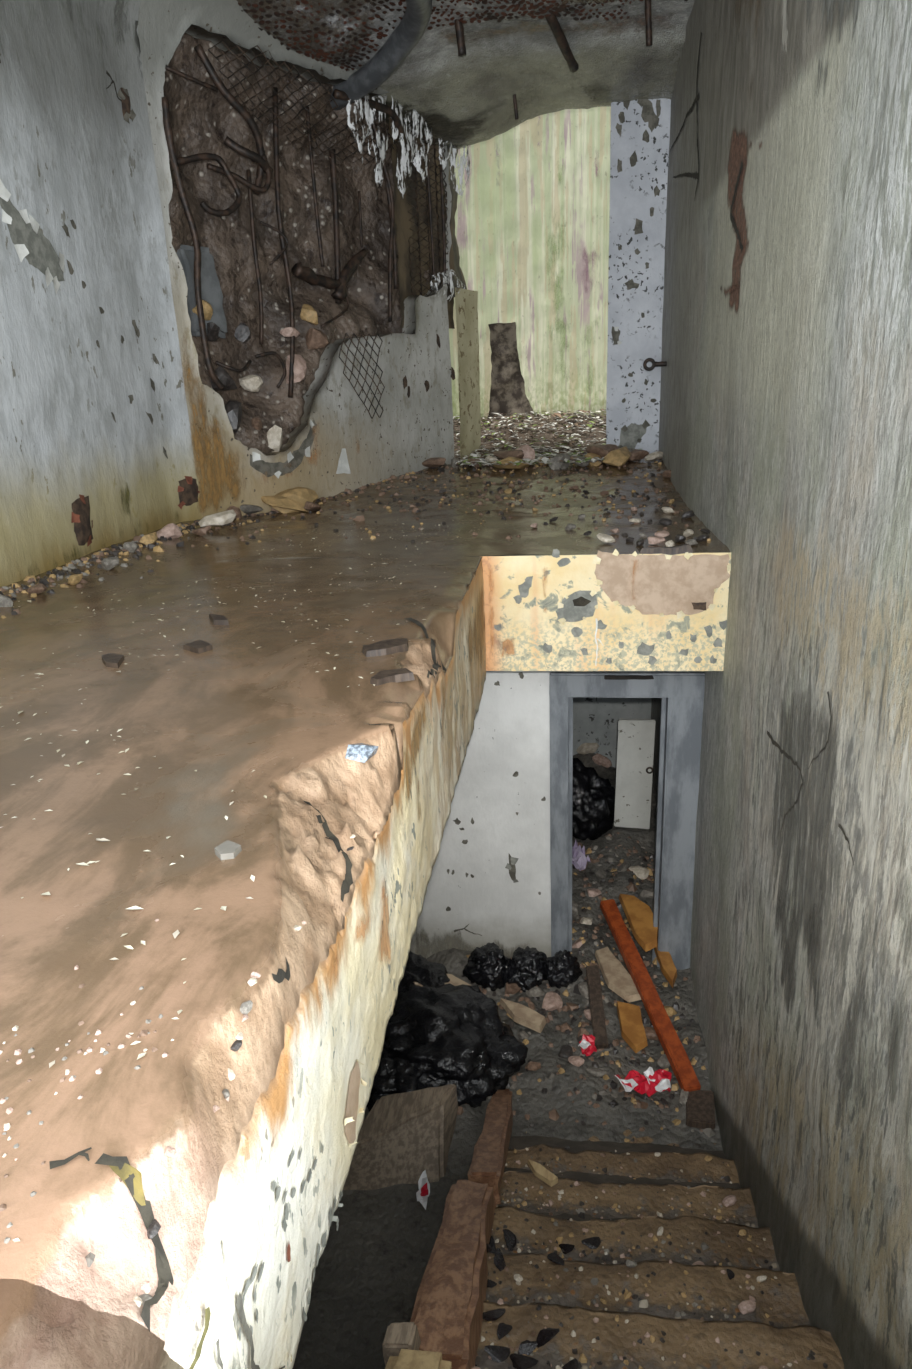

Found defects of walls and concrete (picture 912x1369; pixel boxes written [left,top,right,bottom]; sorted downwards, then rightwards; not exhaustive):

corrosion [237,0,383,65]
spalling [161,33,470,479]
corrosion [720,130,762,313]
corrosion [187,364,240,512]
peeling [513,576,533,604]
peeling [552,549,571,567]
peeling [556,549,731,665]
crack [304,801,353,902]
crack [49,1147,174,1332]